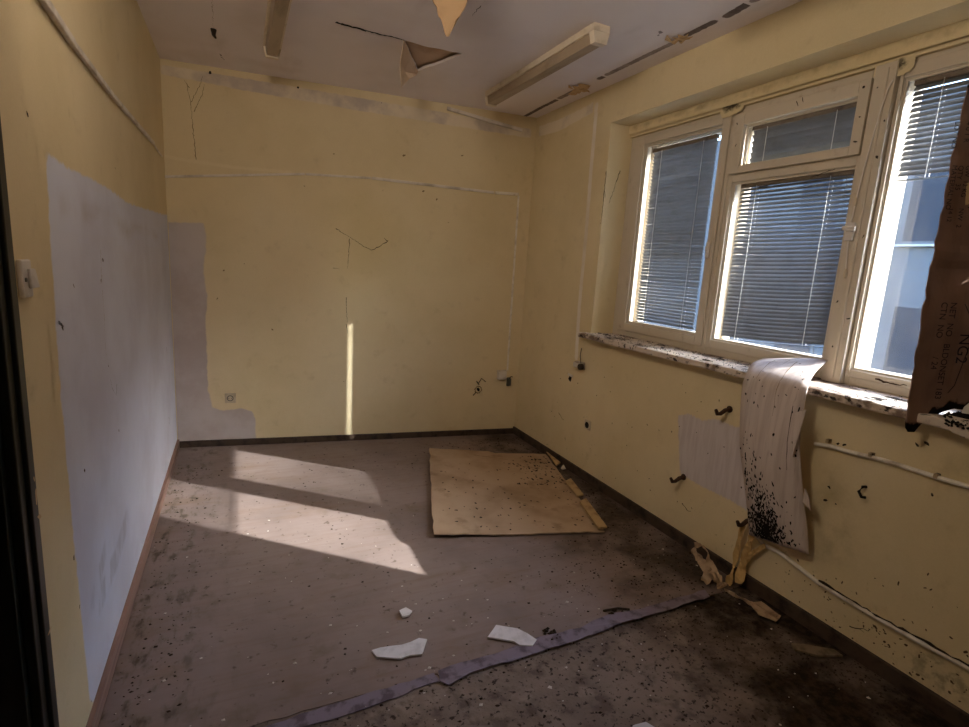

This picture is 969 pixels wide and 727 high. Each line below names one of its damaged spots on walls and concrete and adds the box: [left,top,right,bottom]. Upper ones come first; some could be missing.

crack [335,22,403,44]
damp [740,424,969,714]